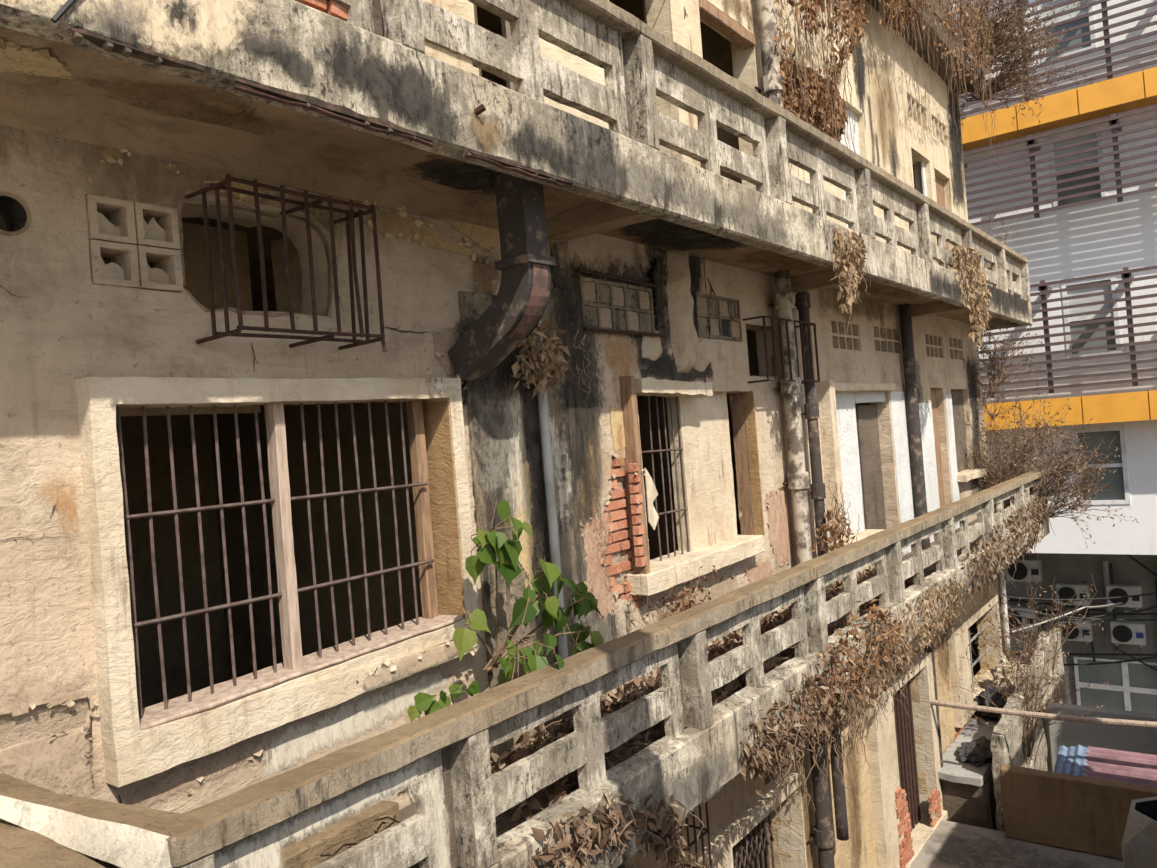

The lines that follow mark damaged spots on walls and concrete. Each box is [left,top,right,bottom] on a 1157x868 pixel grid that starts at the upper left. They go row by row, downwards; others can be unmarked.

peeling [0,38,73,85]
damp [853,38,900,177]
damp [947,86,965,211]
damp [0,0,817,651]
rust [507,263,548,338]
spalling [580,458,794,623]
peeling [0,667,104,798]
mould [511,749,734,868]
spalling [895,787,914,868]
spalling [928,789,943,828]